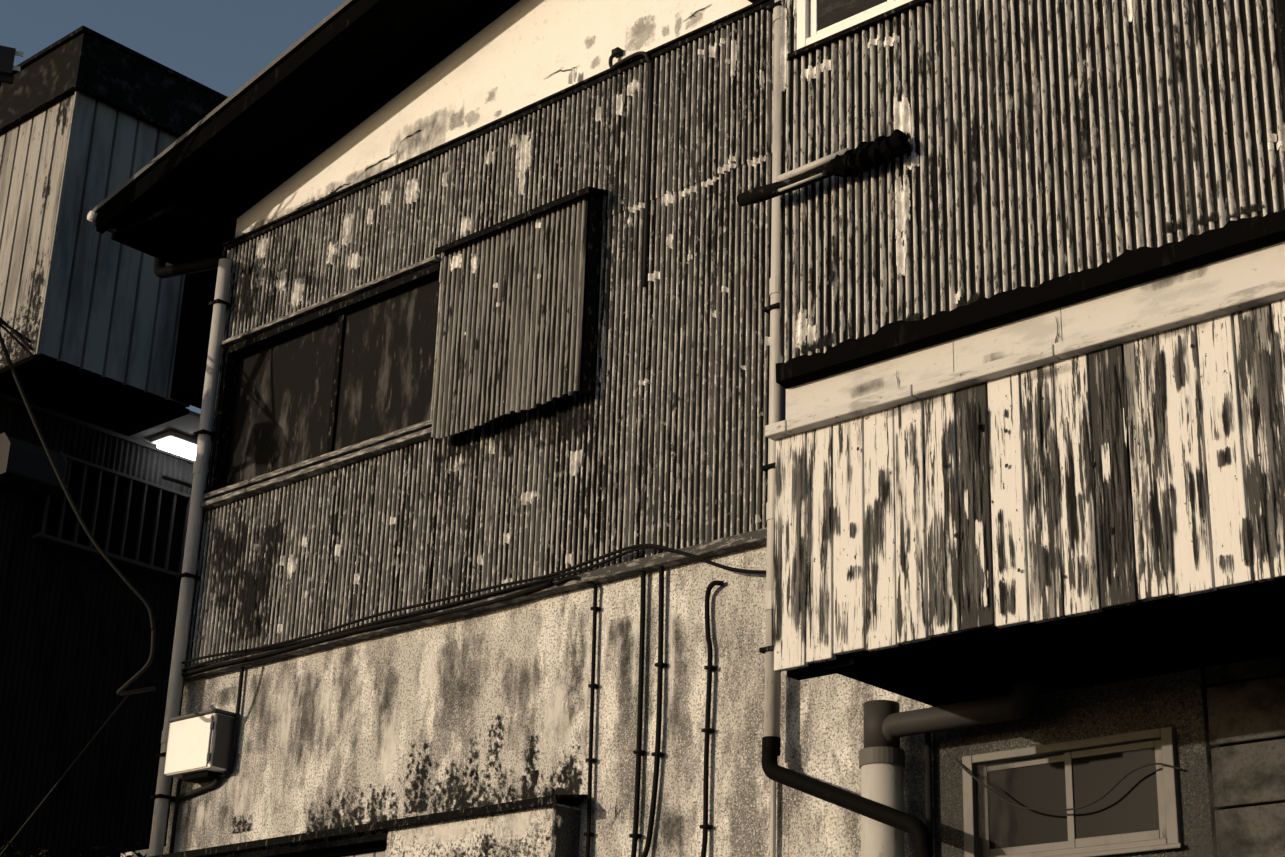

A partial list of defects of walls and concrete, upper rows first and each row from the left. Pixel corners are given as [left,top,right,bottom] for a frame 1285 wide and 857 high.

peeling [568,36,598,84]
peeling [627,11,702,50]
peeling [698,38,737,76]
peeling [449,88,501,130]
peeling [595,79,639,122]
peeling [1026,315,1285,599]
peeling [755,400,1014,648]
leakage [605,612,639,684]
leakage [669,611,680,665]
leakage [188,635,590,857]